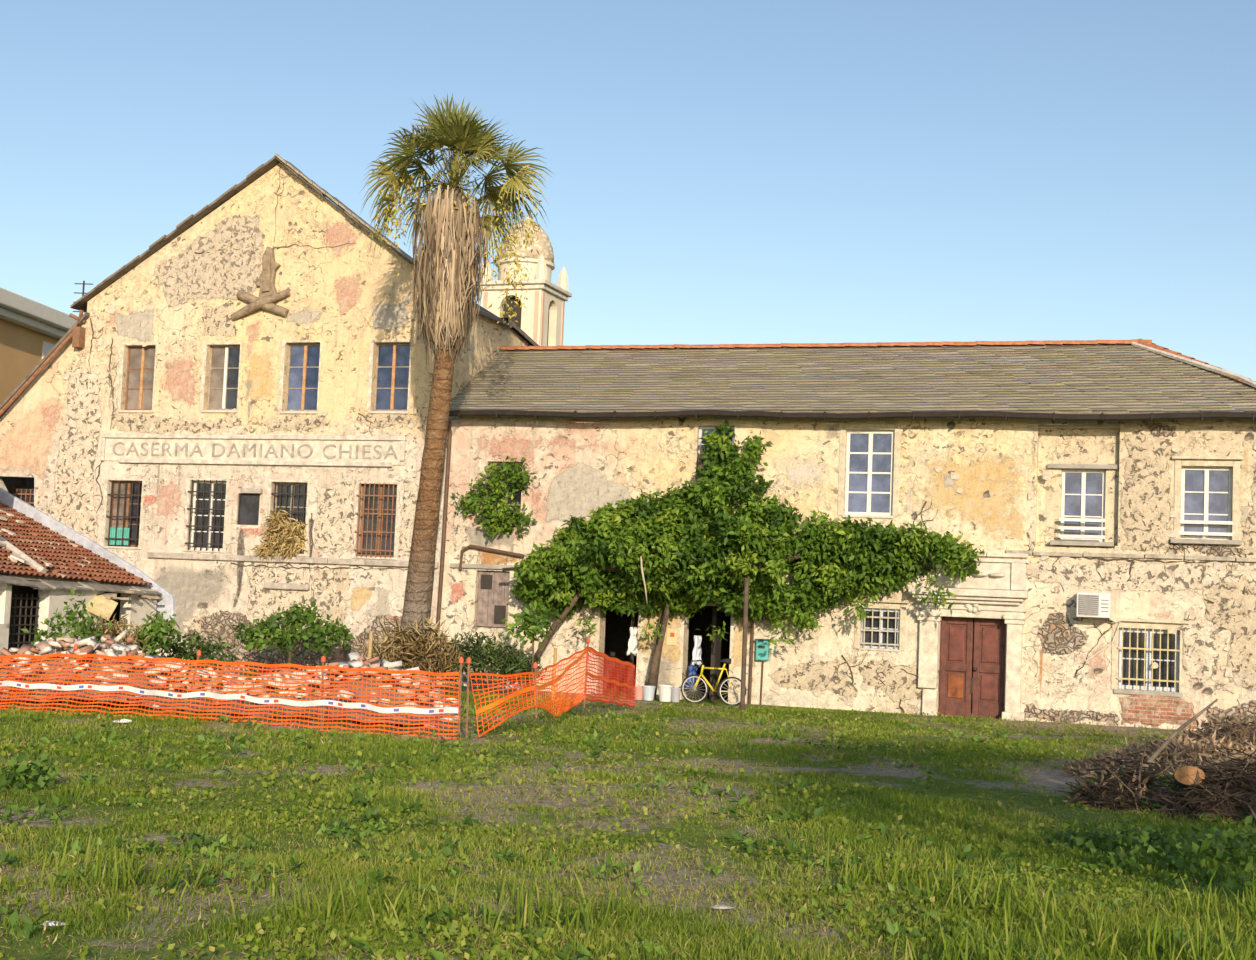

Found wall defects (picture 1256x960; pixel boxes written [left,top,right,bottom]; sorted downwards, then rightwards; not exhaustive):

flaking render [154,212,265,311]
spalling [934,466,963,494]
flaking render [1026,429,1256,729]
flaking render [763,653,933,710]